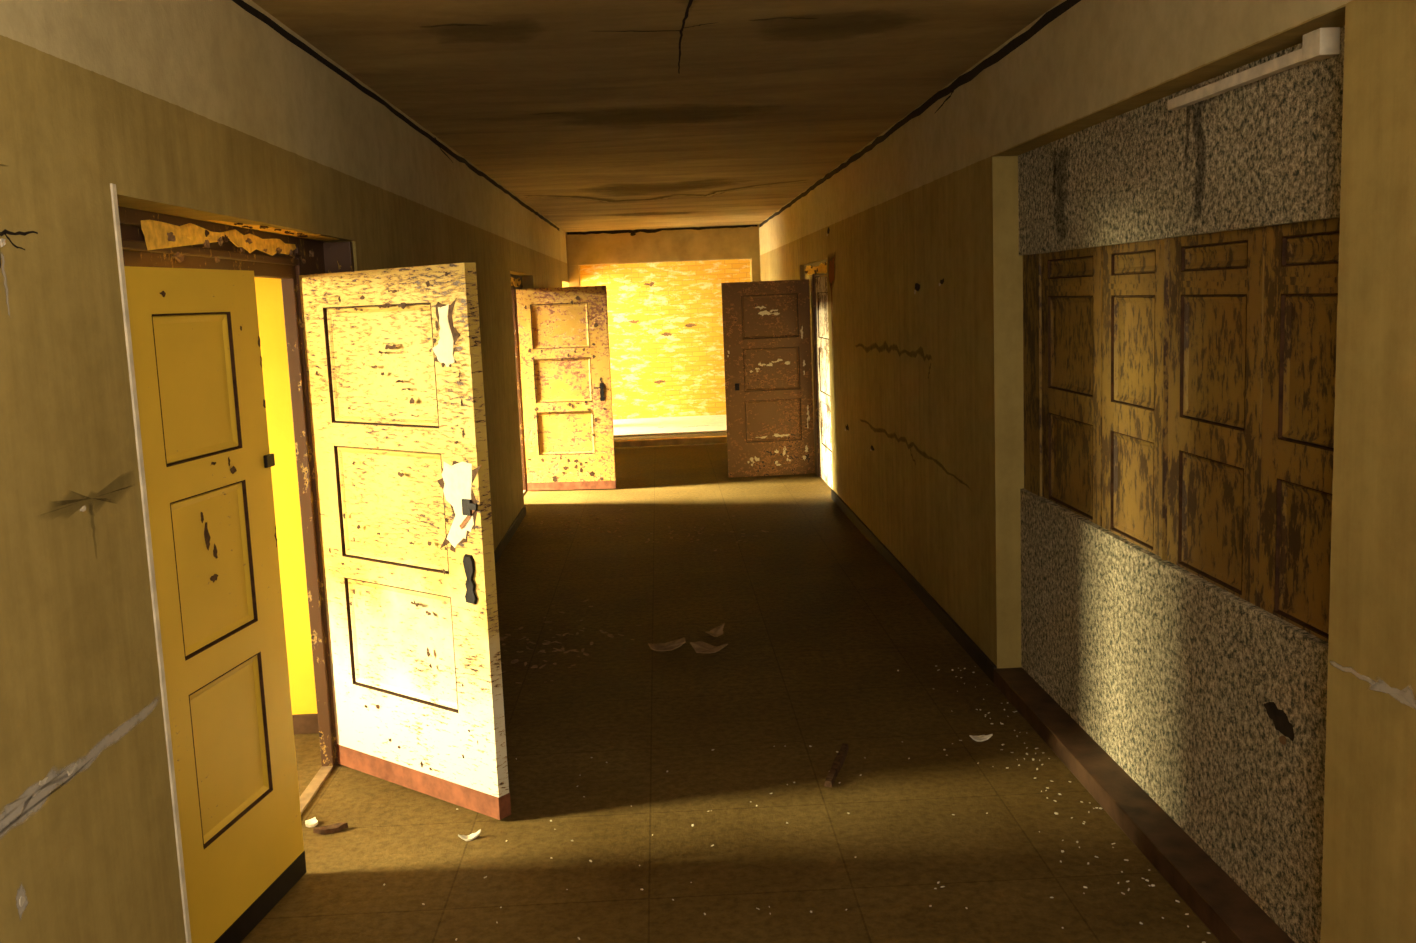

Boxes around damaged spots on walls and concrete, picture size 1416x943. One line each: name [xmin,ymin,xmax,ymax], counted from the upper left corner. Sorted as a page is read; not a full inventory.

crack [232,0,1081,236]
crack [0,229,38,250]
peeling [141,220,340,264]
spalling [338,290,409,311]
spalling [371,344,419,417]
peeling [429,298,463,406]
peeling [409,461,481,552]
spalling [201,512,218,583]